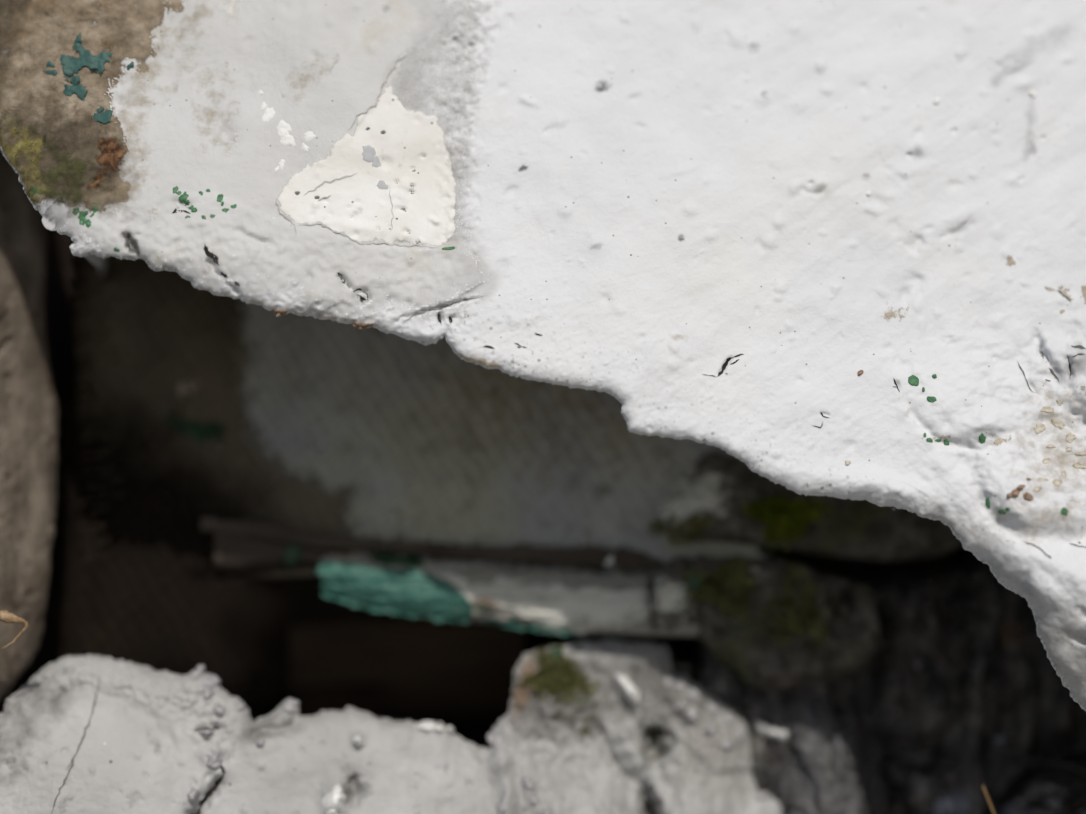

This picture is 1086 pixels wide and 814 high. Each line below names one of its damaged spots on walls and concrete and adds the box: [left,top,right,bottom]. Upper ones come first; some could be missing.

peeling [0,0,184,231]
peeling [258,56,456,250]
crack [642,779,657,814]